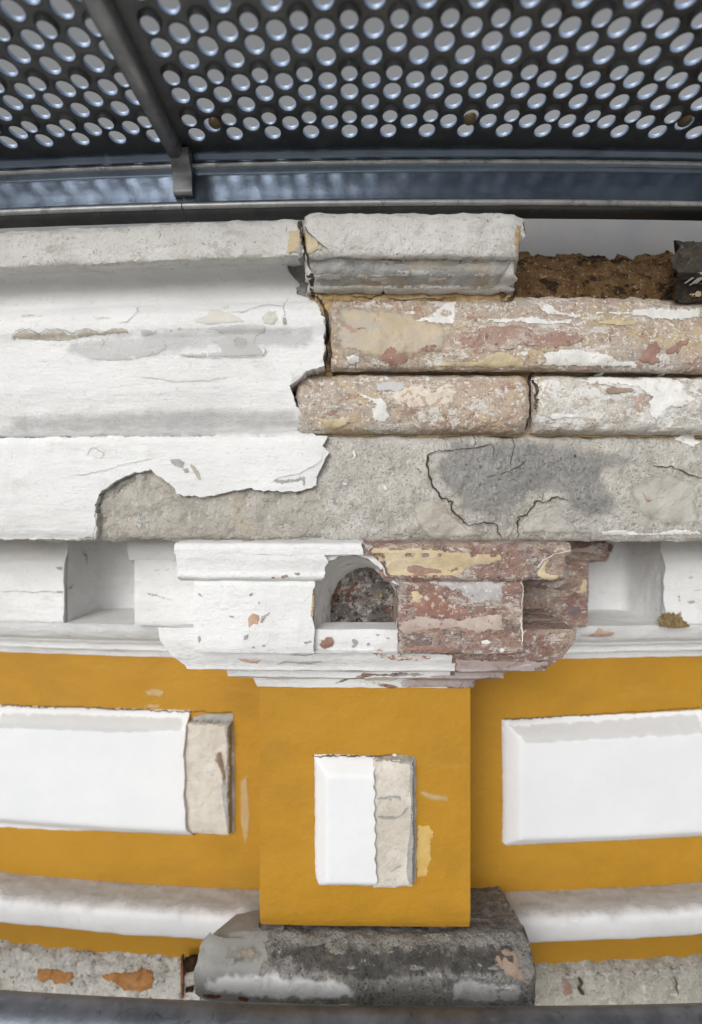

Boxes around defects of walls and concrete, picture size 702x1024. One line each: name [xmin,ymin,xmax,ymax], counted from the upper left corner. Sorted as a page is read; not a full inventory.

peeling [11,328,128,341]
peeling [179,305,287,358]
flaking render [373,345,441,366]
peeling [361,381,457,422]
flaking render [403,301,700,420]
crack [426,369,567,539]
spalling [69,459,322,542]
flaking render [335,539,614,688]
peeling [192,713,235,834]
peeling [375,754,433,886]
flaking render [37,968,74,984]
flaking render [102,968,154,992]